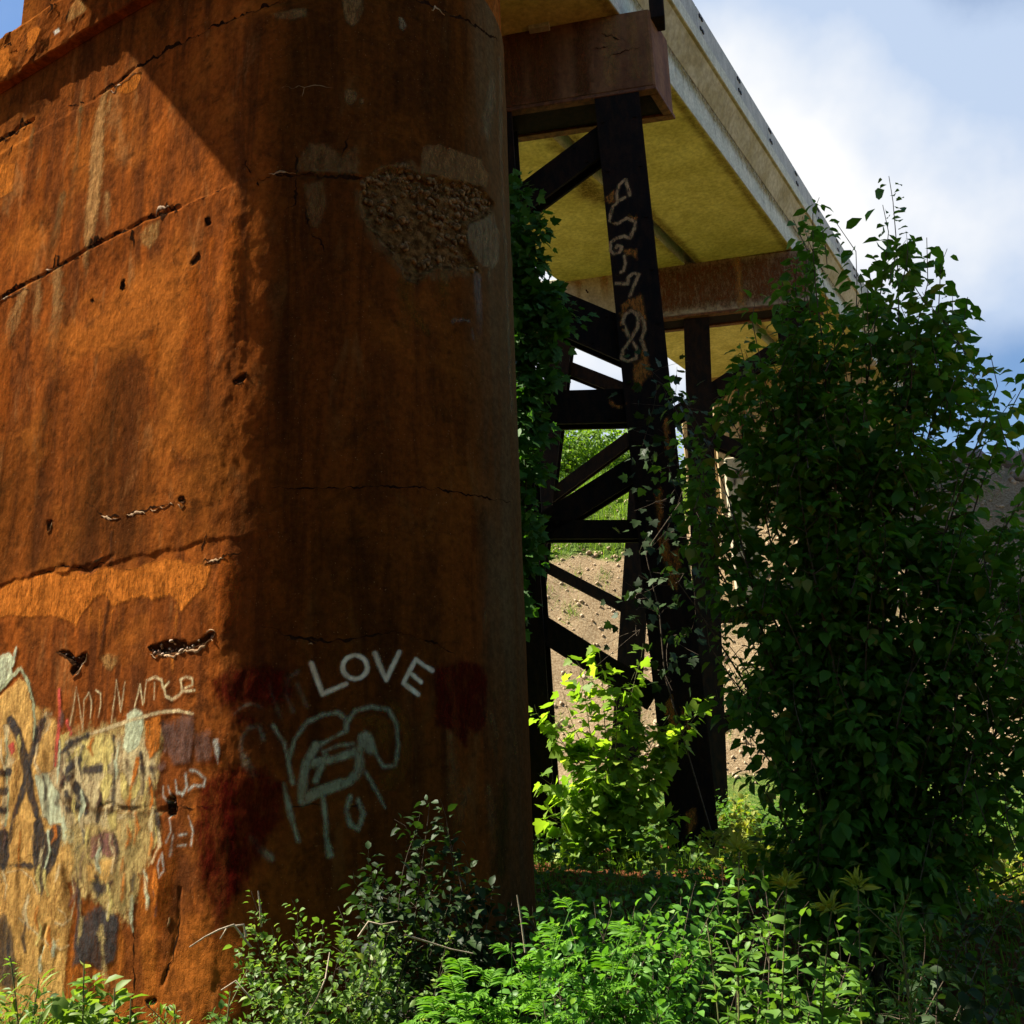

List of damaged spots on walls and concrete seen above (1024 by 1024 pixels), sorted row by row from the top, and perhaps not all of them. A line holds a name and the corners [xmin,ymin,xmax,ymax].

crack [68,1,294,110]
crack [0,117,32,154]
crack [243,136,363,253]
spalling [358,162,496,286]
crack [0,191,218,301]
crack [270,485,510,503]
crack [35,557,157,577]
crack [198,533,240,567]
peeling [0,559,210,629]
spalling [56,650,88,678]
spalling [147,629,215,663]